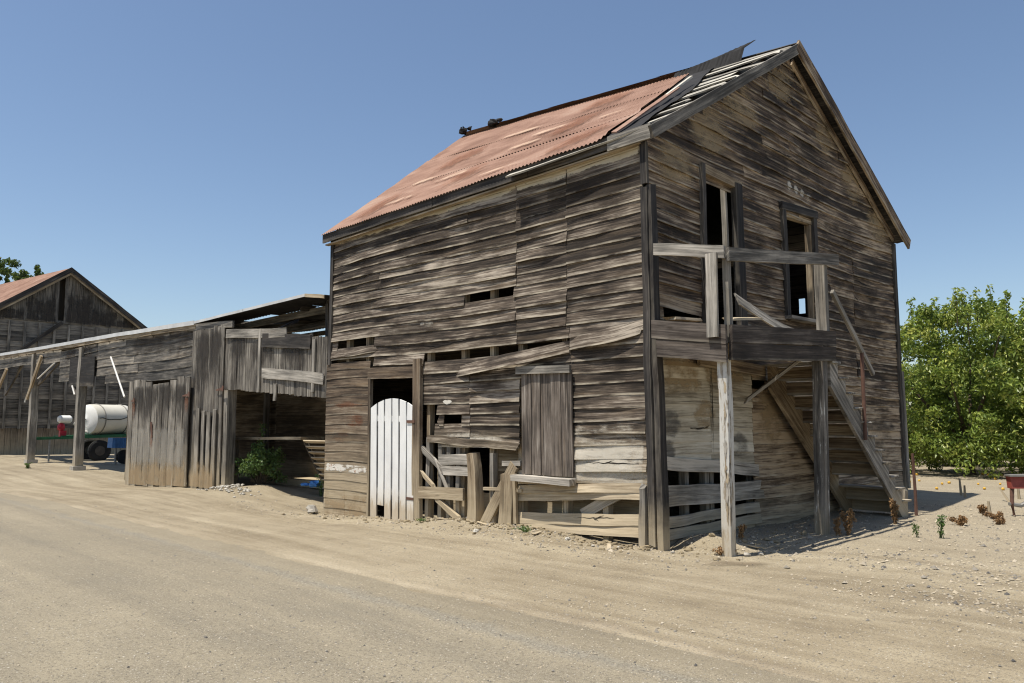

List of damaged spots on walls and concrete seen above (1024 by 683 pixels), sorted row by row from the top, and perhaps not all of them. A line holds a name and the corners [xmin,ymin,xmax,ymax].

peeling [326,463,366,474]